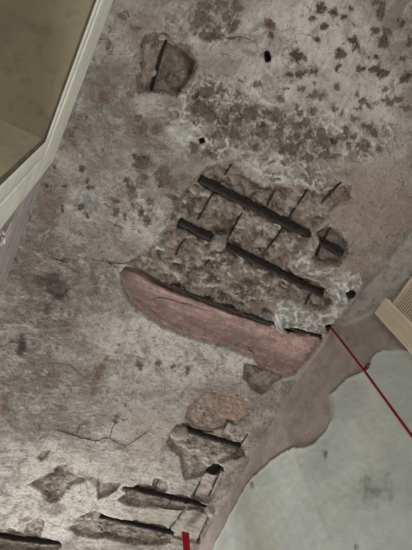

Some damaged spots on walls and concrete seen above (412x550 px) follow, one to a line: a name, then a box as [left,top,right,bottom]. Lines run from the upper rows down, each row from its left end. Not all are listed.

spalling [126,31,199,99]
flaking render [123,177,155,228]
spalling [131,142,352,325]
peeling [70,265,412,550]
crack [50,421,147,446]
flaking render [32,464,85,503]
spalling [0,518,62,550]